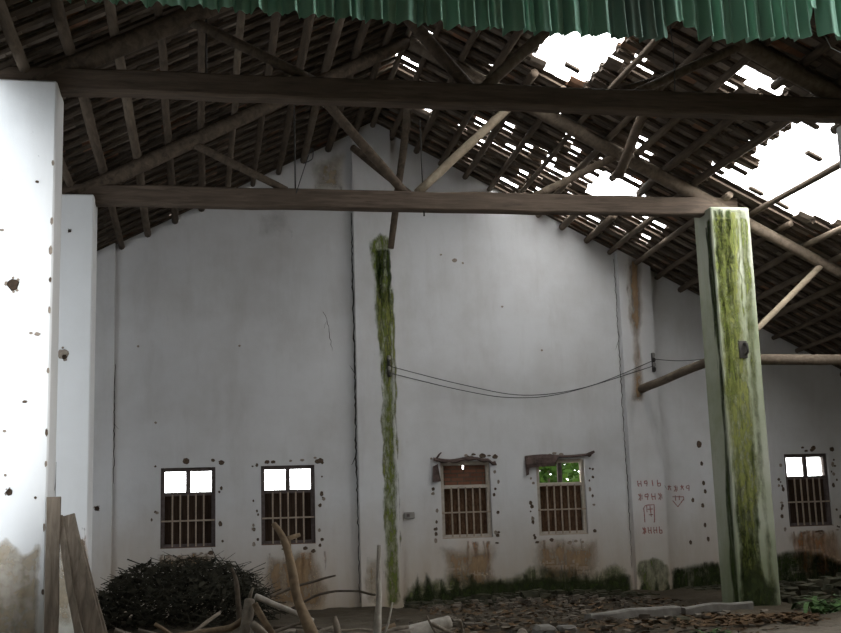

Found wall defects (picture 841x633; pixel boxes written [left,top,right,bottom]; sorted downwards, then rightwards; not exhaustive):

spalling [4,276,20,293]
rust [630,260,640,333]
spalling [58,347,69,361]
leakage [449,542,489,585]
leakage [541,545,592,580]
leakage [0,544,38,633]